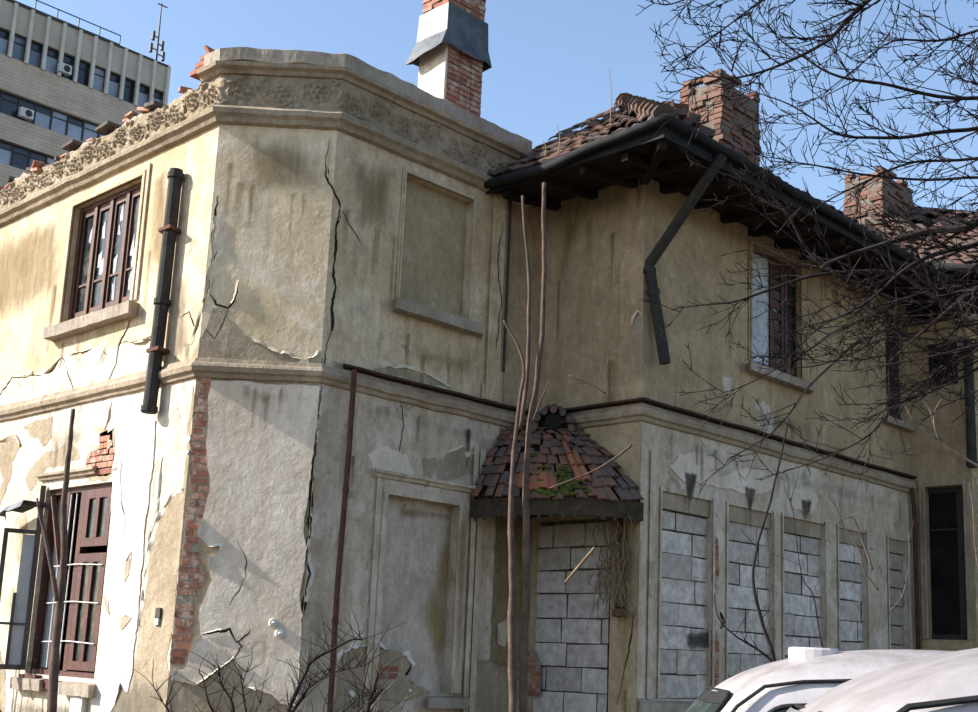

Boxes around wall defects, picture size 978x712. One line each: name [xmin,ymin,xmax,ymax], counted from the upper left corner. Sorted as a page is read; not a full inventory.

damp [228,150,303,212]
damp [0,228,55,316]
crack [180,196,239,346]
crack [0,318,151,395]
spalling [192,307,452,389]
crack [301,138,361,623]
peeling [0,377,320,712]
crack [201,541,251,658]
peeling [497,619,508,647]
spalling [456,651,541,712]